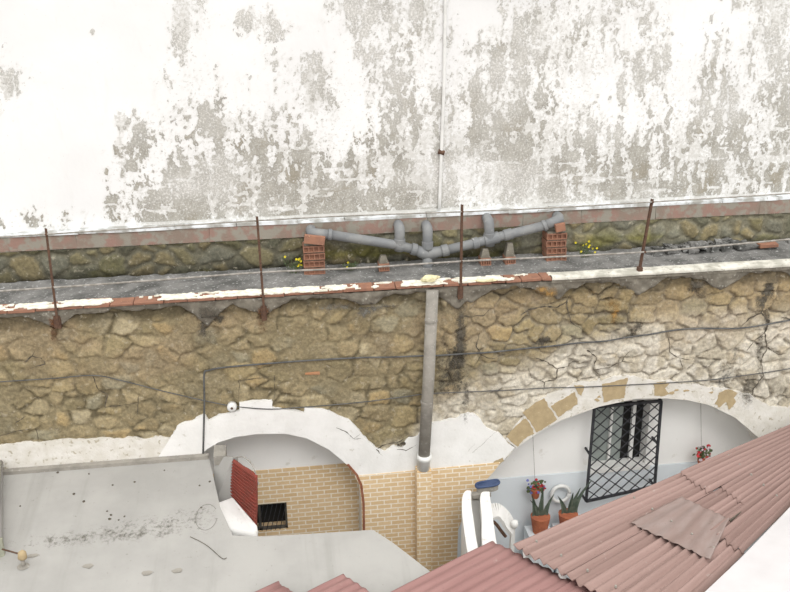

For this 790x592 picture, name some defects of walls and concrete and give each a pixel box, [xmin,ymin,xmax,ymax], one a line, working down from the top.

peeling [0,67,22,96]
peeling [104,0,790,222]
peeling [20,206,52,227]
crack [521,295,582,330]
water stain [441,307,468,405]
crack [527,350,630,390]
crack [743,299,790,395]